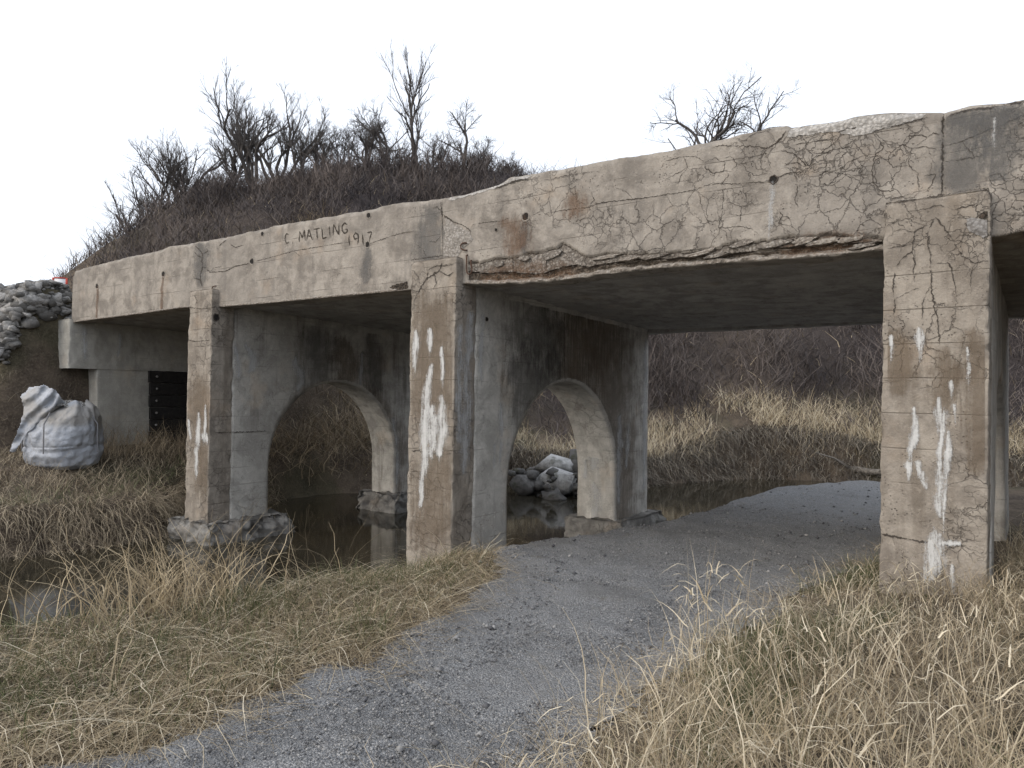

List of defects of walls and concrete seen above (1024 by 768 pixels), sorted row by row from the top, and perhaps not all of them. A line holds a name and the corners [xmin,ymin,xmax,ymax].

crack [189,206,508,309]
spalling [443,219,883,283]
crack [495,100,1024,344]
damp [188,405,208,476]
damp [412,313,485,508]
damp [905,380,961,588]
crack [882,533,976,547]